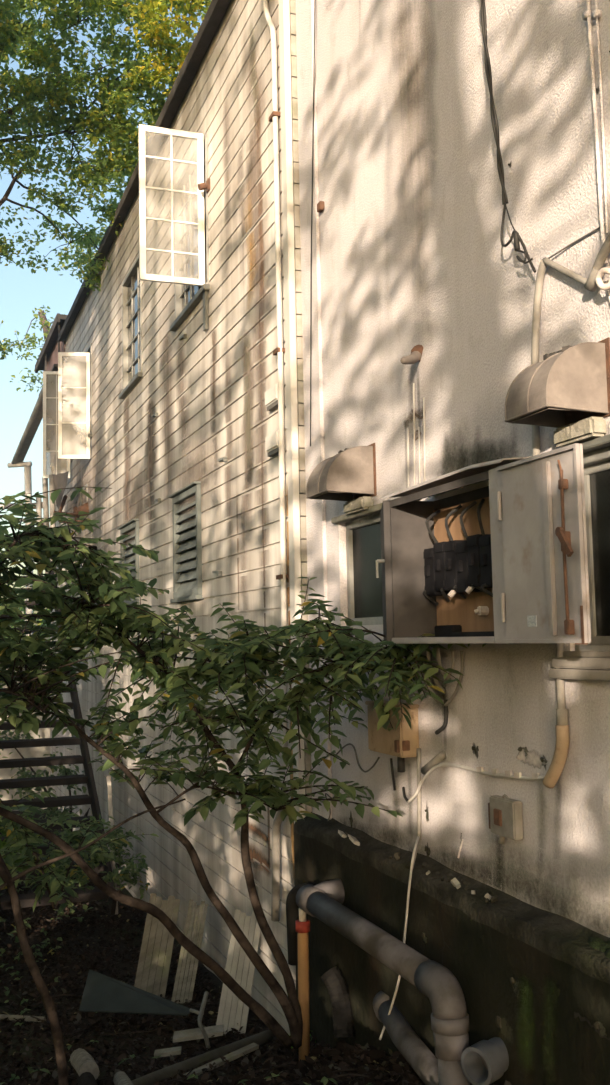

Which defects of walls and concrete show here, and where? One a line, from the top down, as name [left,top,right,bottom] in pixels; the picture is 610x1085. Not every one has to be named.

rust [248,63,264,298]
damp [124,345,187,530]
damp [225,343,253,516]
rust [257,314,267,634]
damp [448,452,502,473]